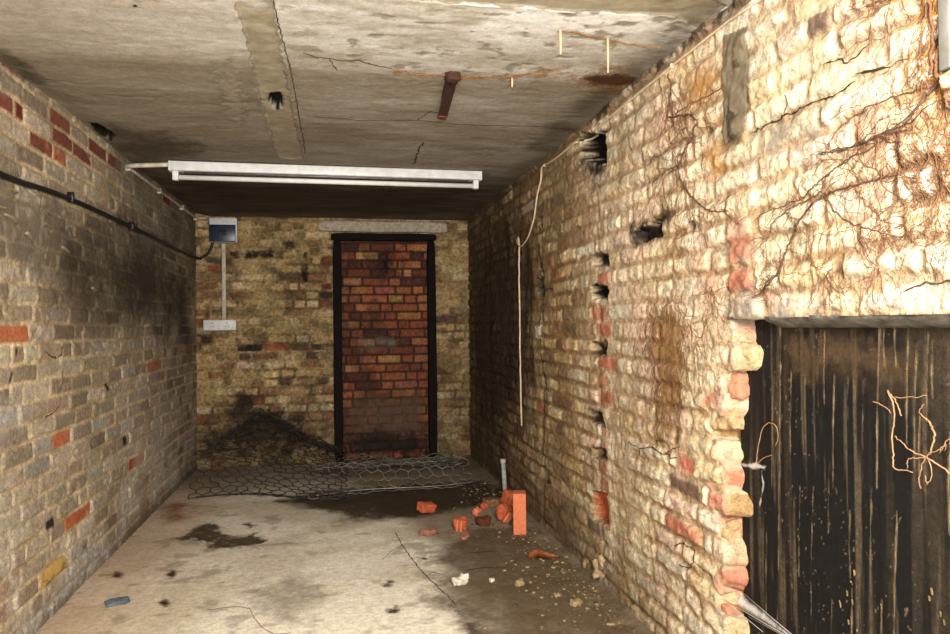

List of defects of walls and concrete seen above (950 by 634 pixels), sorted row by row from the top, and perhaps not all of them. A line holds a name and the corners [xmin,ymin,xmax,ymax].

crack [273,0,660,163]
rust [571,67,634,93]
crack [752,44,893,133]
spalling [594,283,609,300]
crack [902,258,950,292]